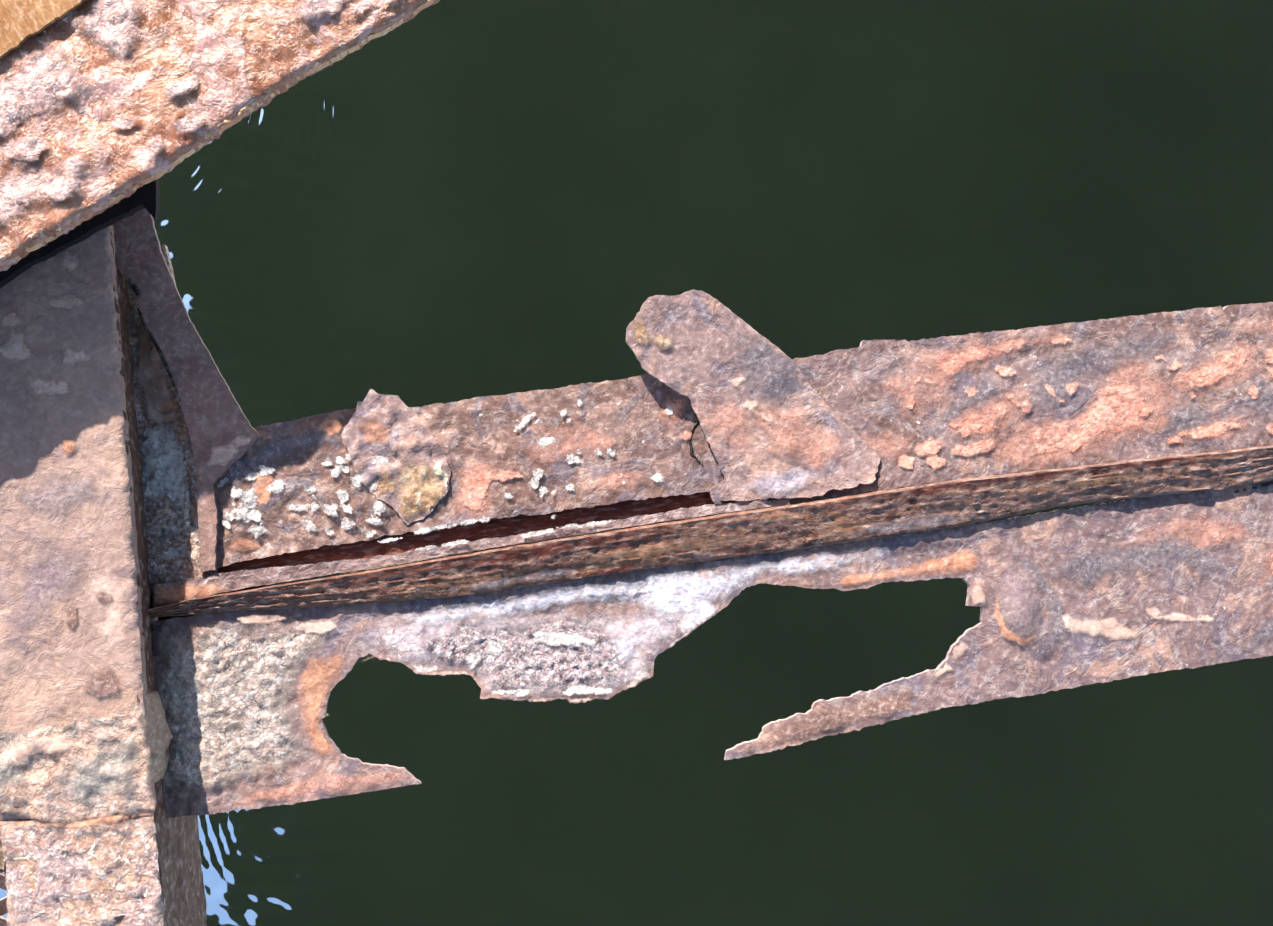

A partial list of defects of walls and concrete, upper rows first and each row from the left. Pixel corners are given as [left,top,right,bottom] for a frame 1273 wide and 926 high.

crack [663,385,710,466]
rust [376,463,443,517]
rust [324,524,756,586]
rust [841,551,974,585]
rust [92,569,129,646]
peeling [973,587,984,604]
peeling [417,632,476,675]
peeling [498,647,612,701]
peeling [937,643,965,676]
rust [302,656,340,750]
rust [745,689,912,751]
rust [2,738,70,764]